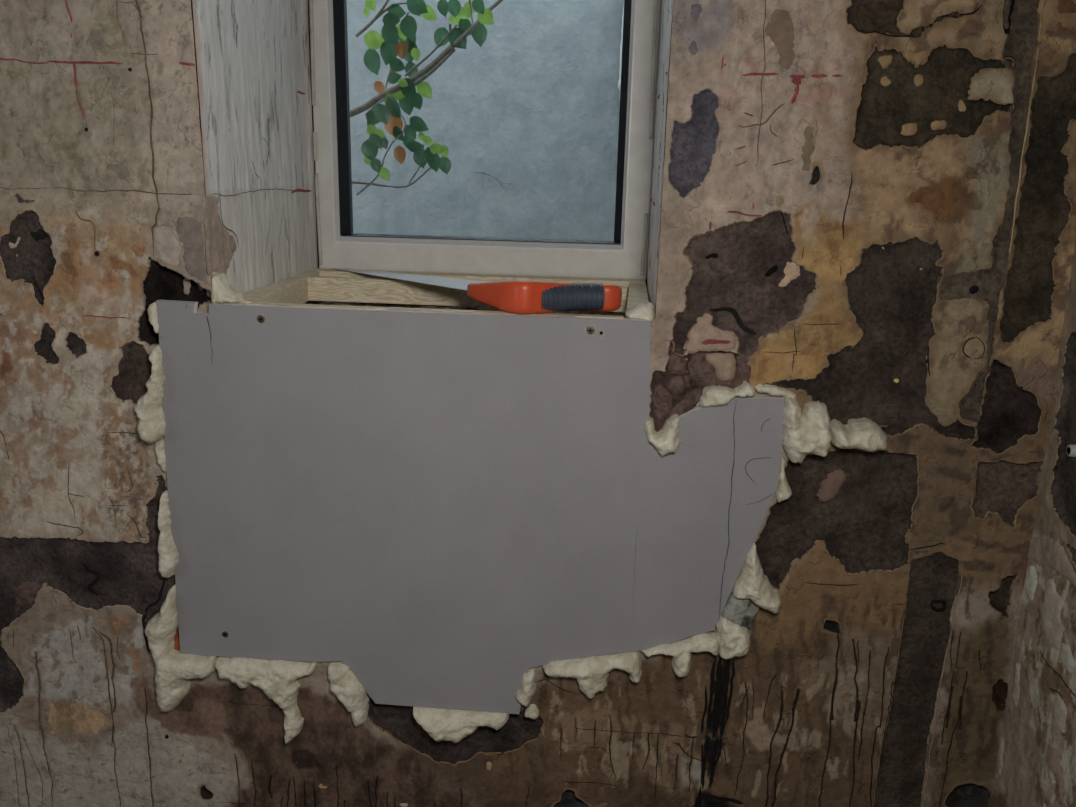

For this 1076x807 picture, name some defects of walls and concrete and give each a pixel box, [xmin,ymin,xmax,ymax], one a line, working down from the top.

flaking render [0,209,58,306]
crack [119,0,160,257]
flaking render [109,195,236,405]
flaking render [667,88,721,198]
flaking render [846,0,1016,151]
flaking render [999,52,1076,345]
flaking render [649,195,1076,674]
flaking render [0,473,176,714]
water stain [131,677,479,807]
flaking render [366,693,545,770]
water stain [674,657,800,807]
water stain [819,594,889,807]